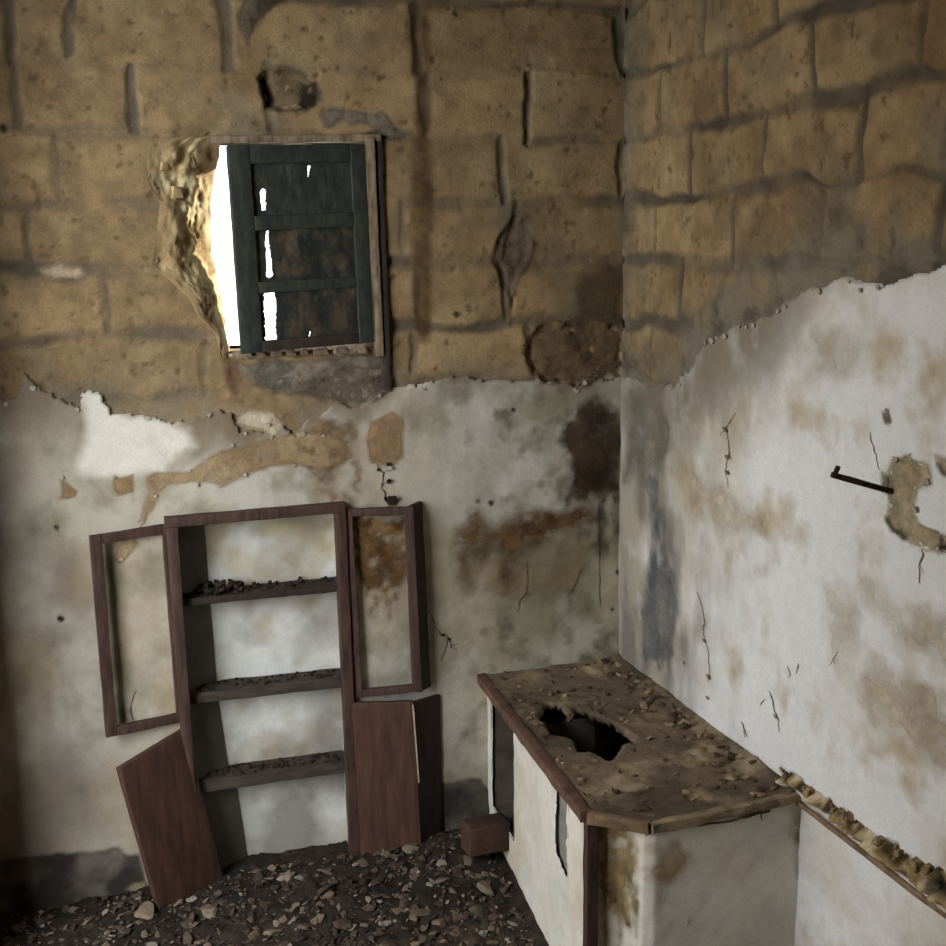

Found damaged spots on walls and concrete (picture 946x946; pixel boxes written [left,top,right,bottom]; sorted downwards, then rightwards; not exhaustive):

flaking render [0,0,946,528]
flaking render [115,539,136,562]
damp [480,387,669,590]
flaking render [882,455,946,553]
damp [642,559,674,662]